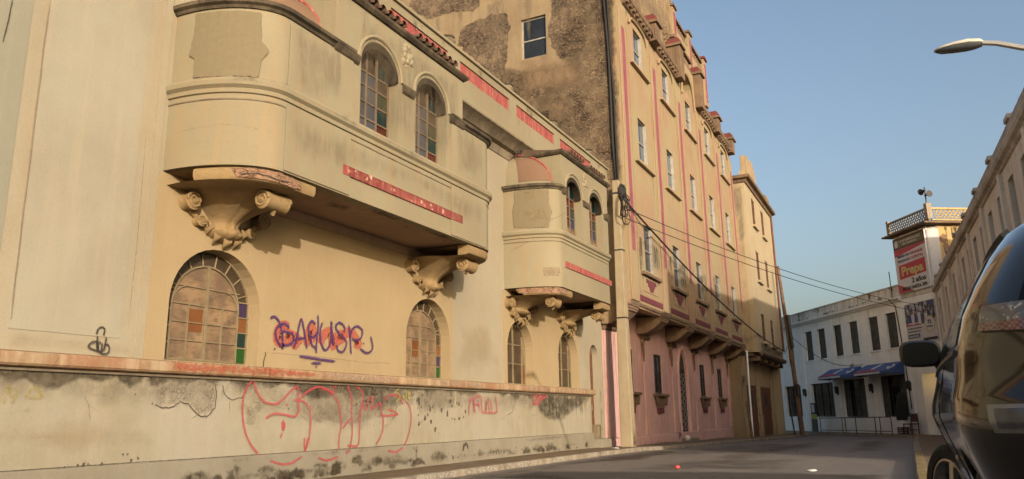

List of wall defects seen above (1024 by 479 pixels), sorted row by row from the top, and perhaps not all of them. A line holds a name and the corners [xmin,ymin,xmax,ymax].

peeling [409,0,619,181]
water stain [233,378,479,407]
water stain [502,391,585,418]